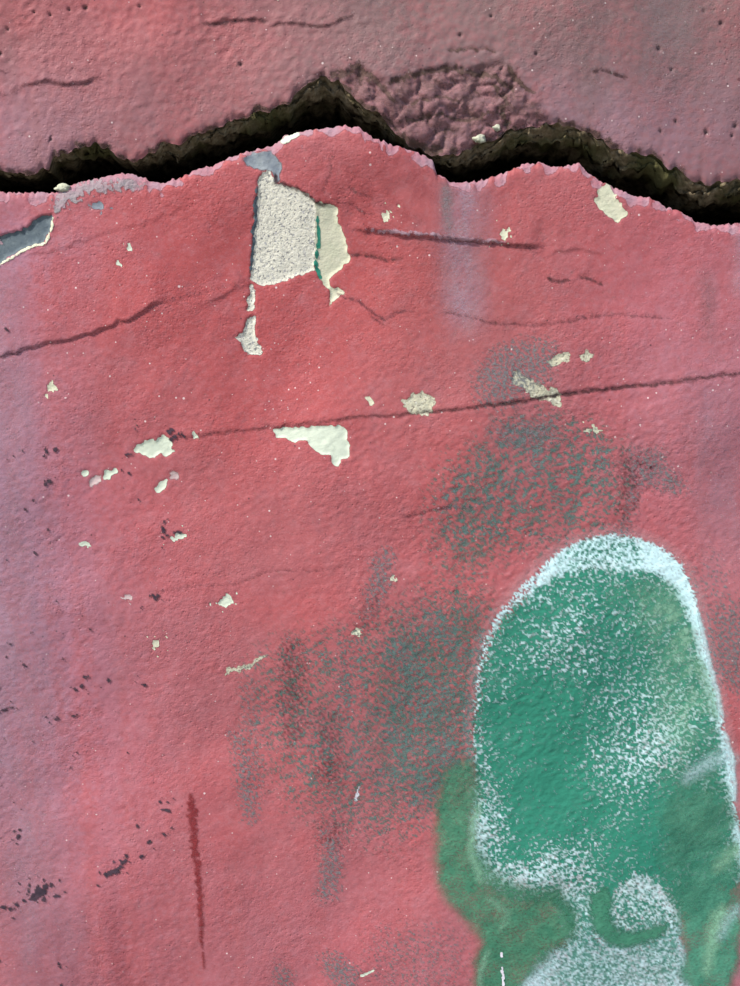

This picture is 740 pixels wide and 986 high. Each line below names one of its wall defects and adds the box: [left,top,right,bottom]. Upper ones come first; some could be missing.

crack [0,75,740,240]
peeling [594,183,628,223]
peeling [0,215,54,264]
peeling [235,151,350,355]
crack [354,192,505,262]
peeling [401,391,436,416]
crack [407,373,735,414]
peeling [134,435,175,458]
peeling [273,425,350,466]